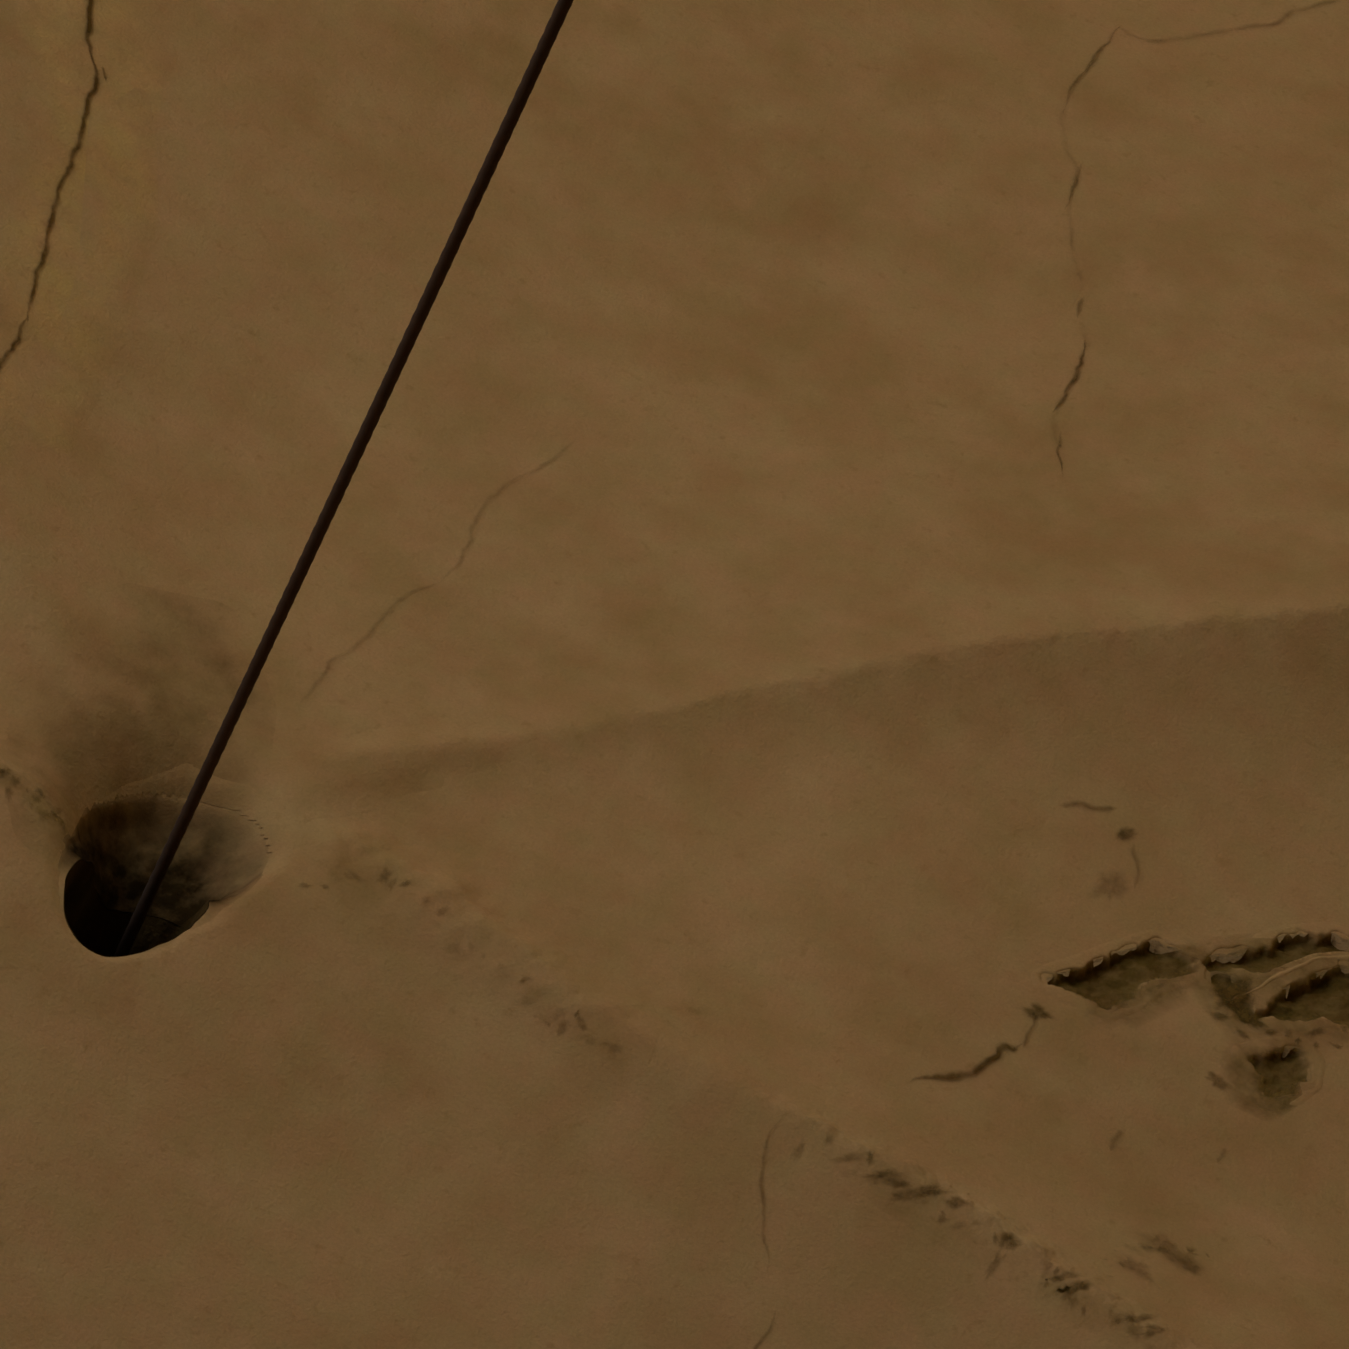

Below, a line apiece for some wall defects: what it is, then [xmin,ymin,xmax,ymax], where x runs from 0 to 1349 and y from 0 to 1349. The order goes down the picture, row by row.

crack [30,0,98,302]
crack [0,334,20,368]
crack [1056,354,1083,407]
flaking render [58,793,271,952]
crack [1028,1006,1047,1018]
flaking render [1030,922,1349,1110]
crack [923,1044,1016,1079]